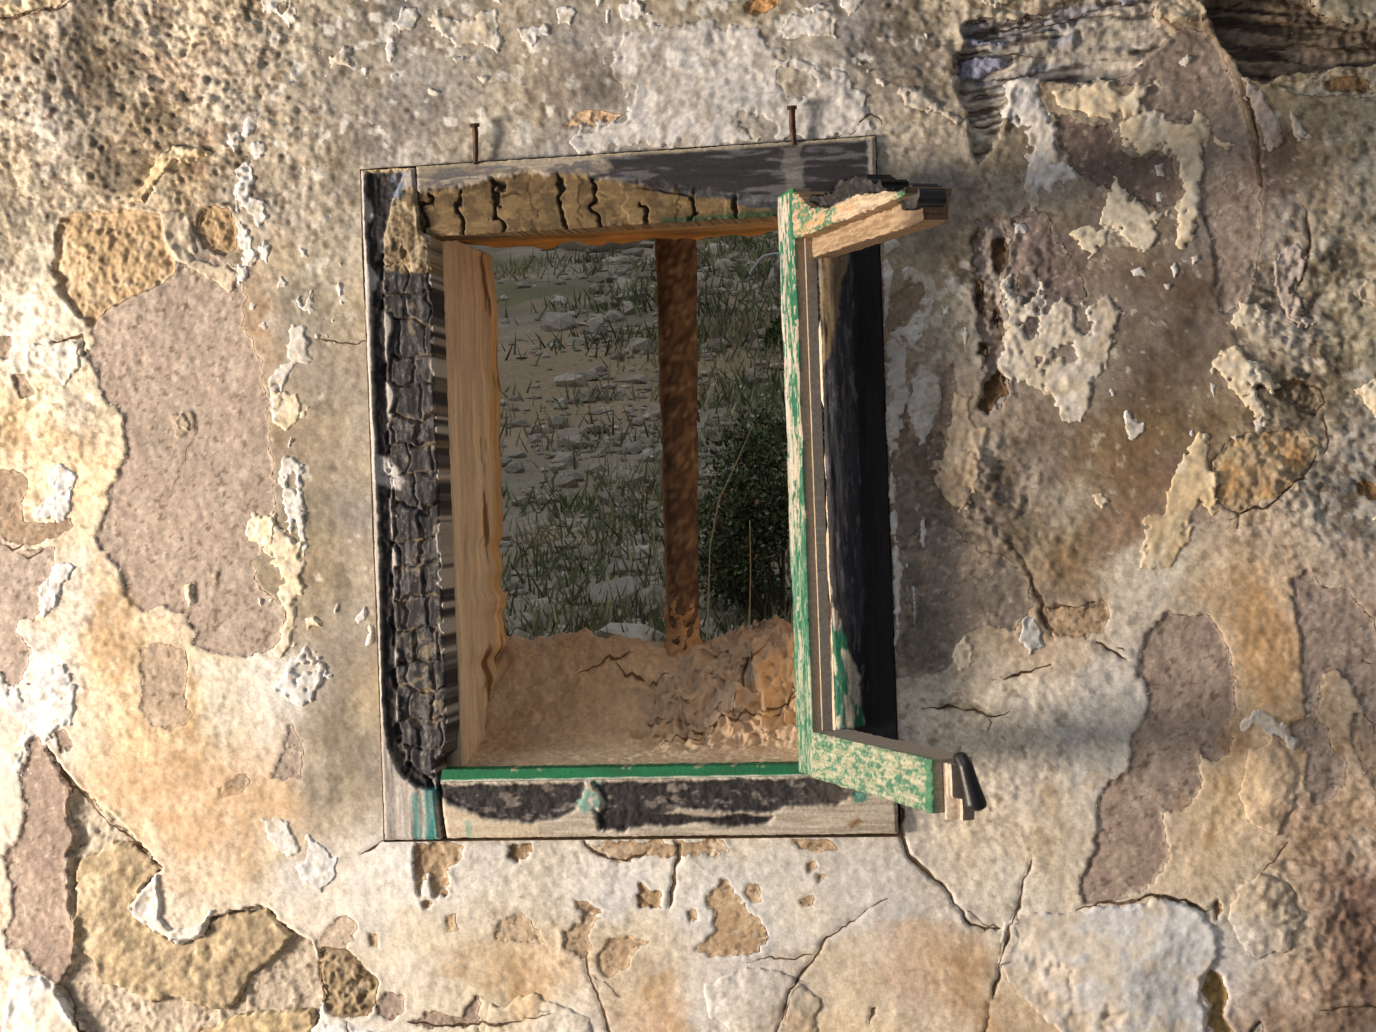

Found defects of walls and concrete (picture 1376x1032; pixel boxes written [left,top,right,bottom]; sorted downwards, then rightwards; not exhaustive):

peeling [562,0,1376,678]
peeling [0,113,343,731]
crack [45,745,162,868]
spalling [0,463,481,1032]
peeling [1078,569,1376,905]
crack [407,1010,551,1032]
crack [585,952,620,1032]
crack [583,840,681,908]
peeling [687,878,768,957]
crack [746,898,888,1032]
crack [901,807,1032,1032]
spalling [1201,970,1233,1032]